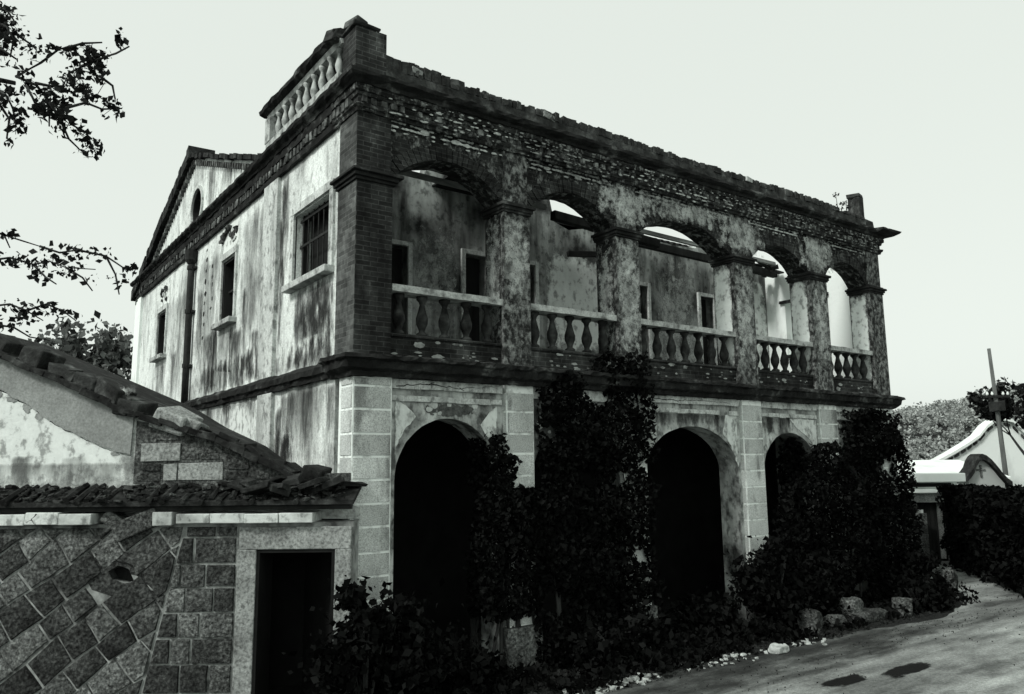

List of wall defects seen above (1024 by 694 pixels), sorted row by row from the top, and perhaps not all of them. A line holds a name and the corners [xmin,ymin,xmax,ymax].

water stain [280,185,288,246]
peeling [389,98,877,260]
water stain [157,296,186,379]
water stain [197,266,258,392]
water stain [276,281,333,373]
peeling [414,341,498,362]
peeling [0,389,368,497]
water stain [273,389,312,460]
flaking render [425,402,478,417]